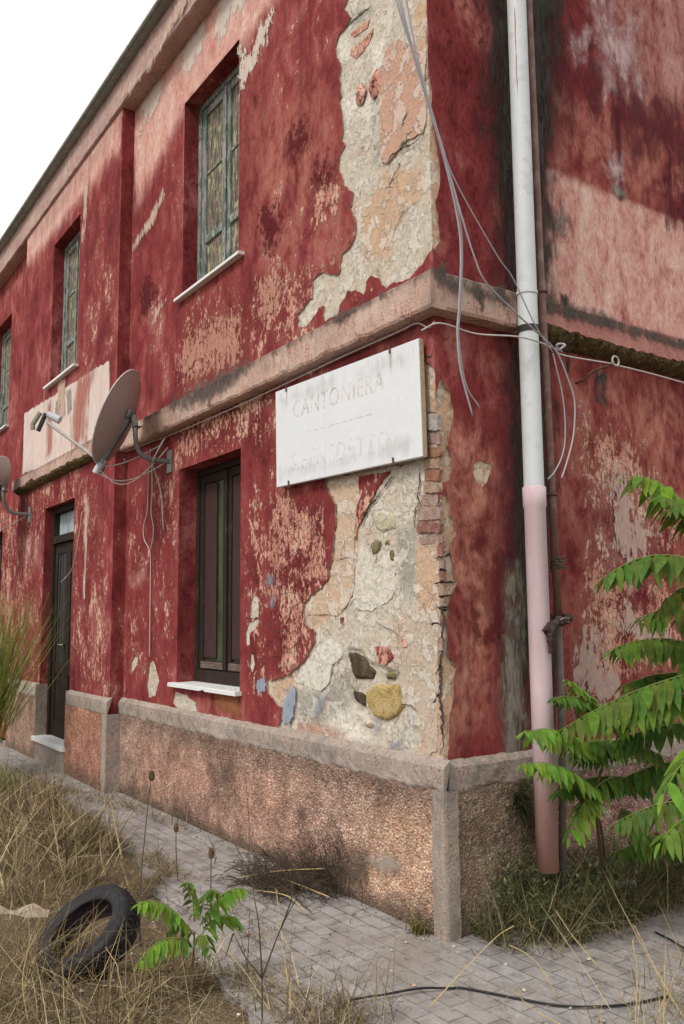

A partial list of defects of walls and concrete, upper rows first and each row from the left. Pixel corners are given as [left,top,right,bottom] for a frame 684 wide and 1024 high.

flaking render [297,0,440,327]
leakage [479,0,517,292]
leakage [532,0,684,349]
peeling [173,258,288,391]
flaking render [267,361,457,759]
crack [398,553,456,756]
peeling [572,622,622,706]
peeling [609,459,654,564]
peeling [616,581,672,641]